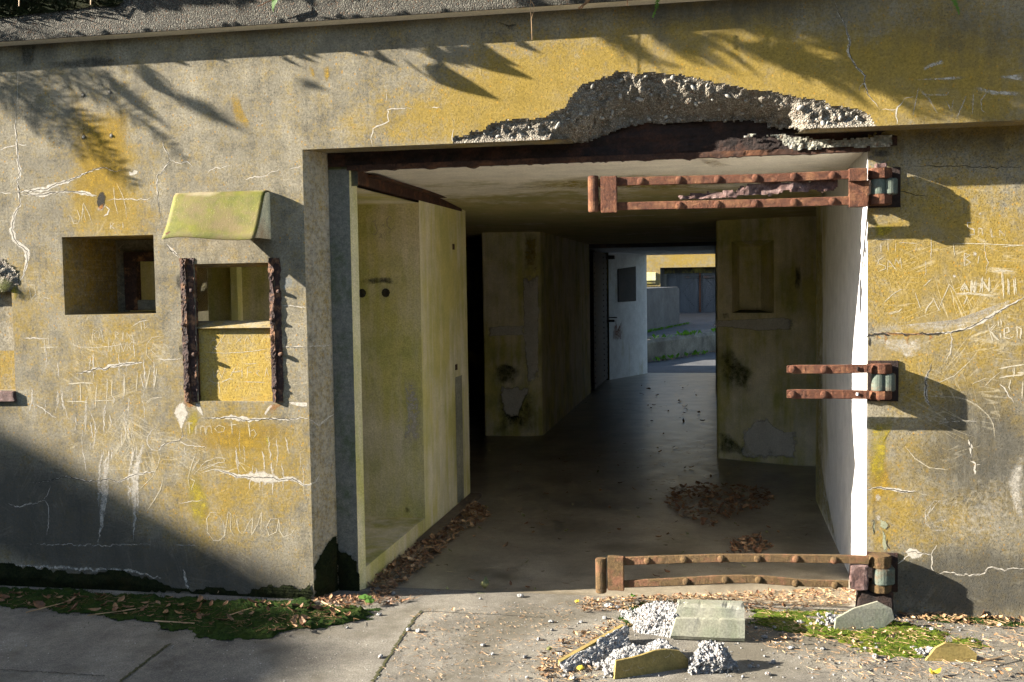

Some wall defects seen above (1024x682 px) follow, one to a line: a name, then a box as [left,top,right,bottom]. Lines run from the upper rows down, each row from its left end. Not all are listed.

spalling [453,70,876,144]
crack [1,78,302,285]
corrosion [678,180,838,200]
flaking render [501,277,539,416]
crack [870,297,1024,405]
crack [204,414,334,426]
crack [9,427,319,530]
crack [898,545,1024,576]